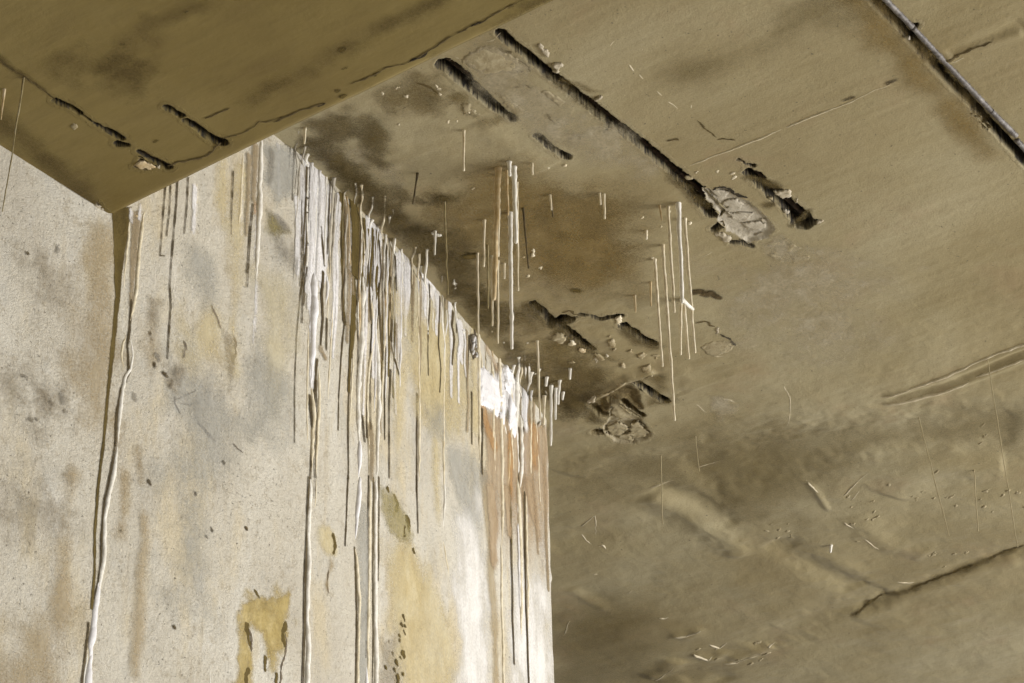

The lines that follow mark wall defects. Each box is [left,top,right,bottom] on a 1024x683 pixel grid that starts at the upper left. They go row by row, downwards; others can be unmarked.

spalling [417,25,825,251]
damp [160,177,198,359]
damp [219,140,295,416]
damp [300,116,635,683]
corrosion [481,406,549,567]
crack [562,310,628,325]
spalling [520,298,672,447]
crack [909,545,1024,590]